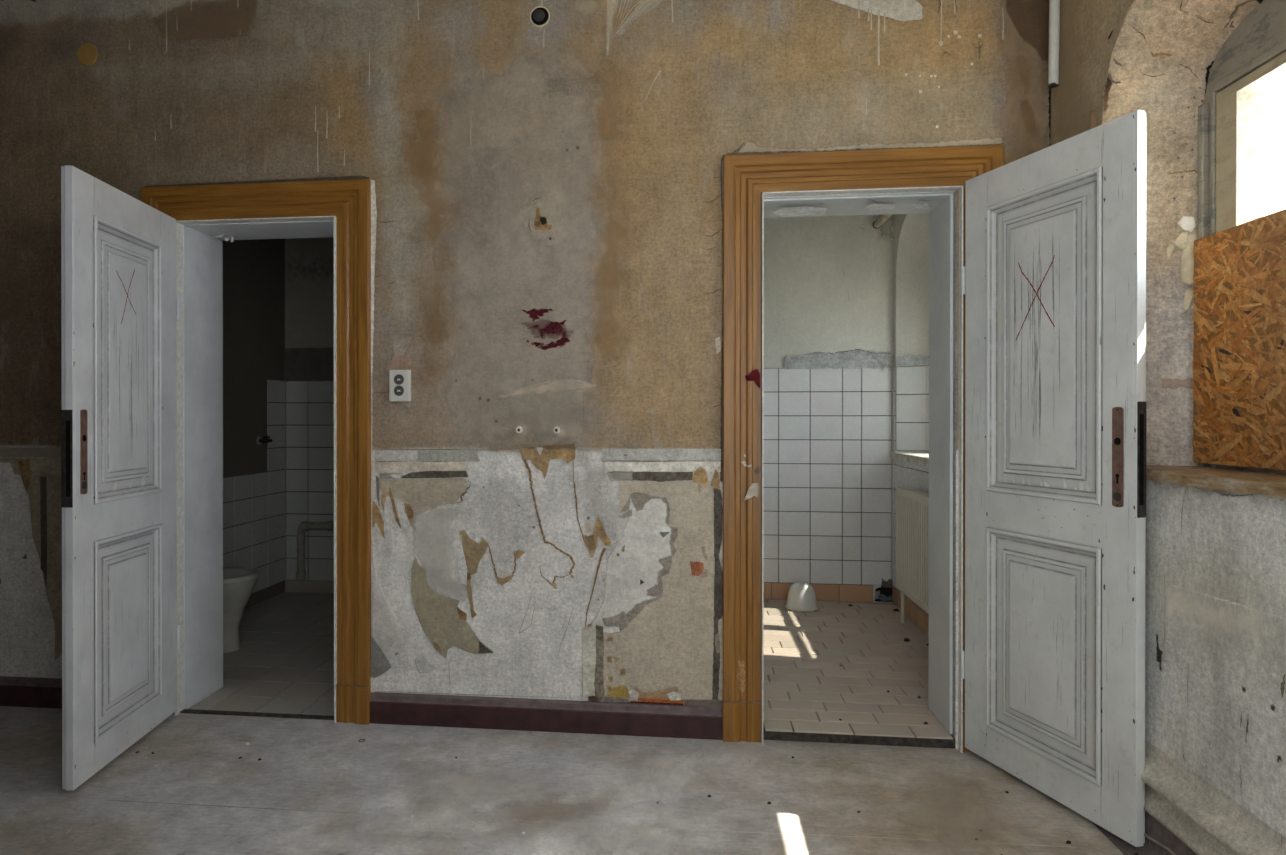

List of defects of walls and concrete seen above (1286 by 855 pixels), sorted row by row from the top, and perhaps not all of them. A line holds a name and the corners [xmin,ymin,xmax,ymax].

peeling [601,448,721,482]
peeling [690,541,723,579]
peeling [666,691,681,701]